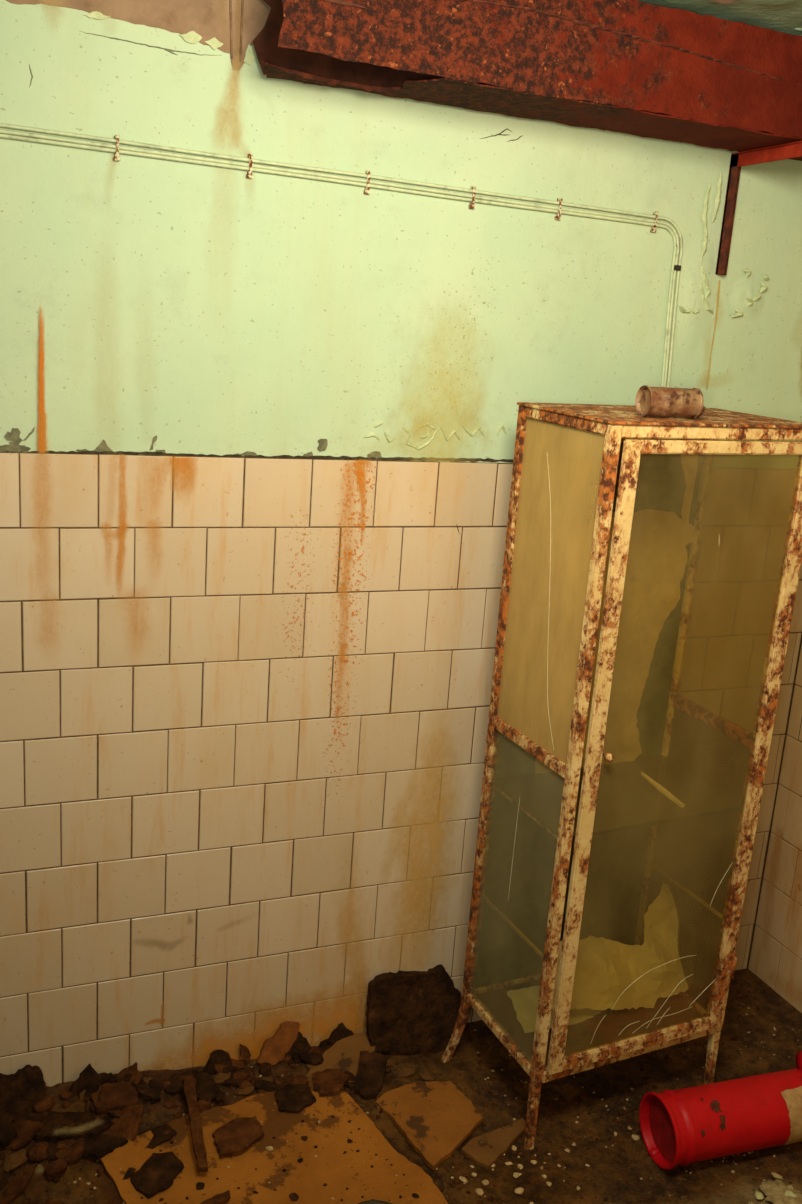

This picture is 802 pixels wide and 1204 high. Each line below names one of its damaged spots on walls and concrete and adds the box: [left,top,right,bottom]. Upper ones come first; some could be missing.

peeling [6,0,271,71]
rust [38,309,46,453]
rust [118,456,126,575]
rust [326,460,375,786]